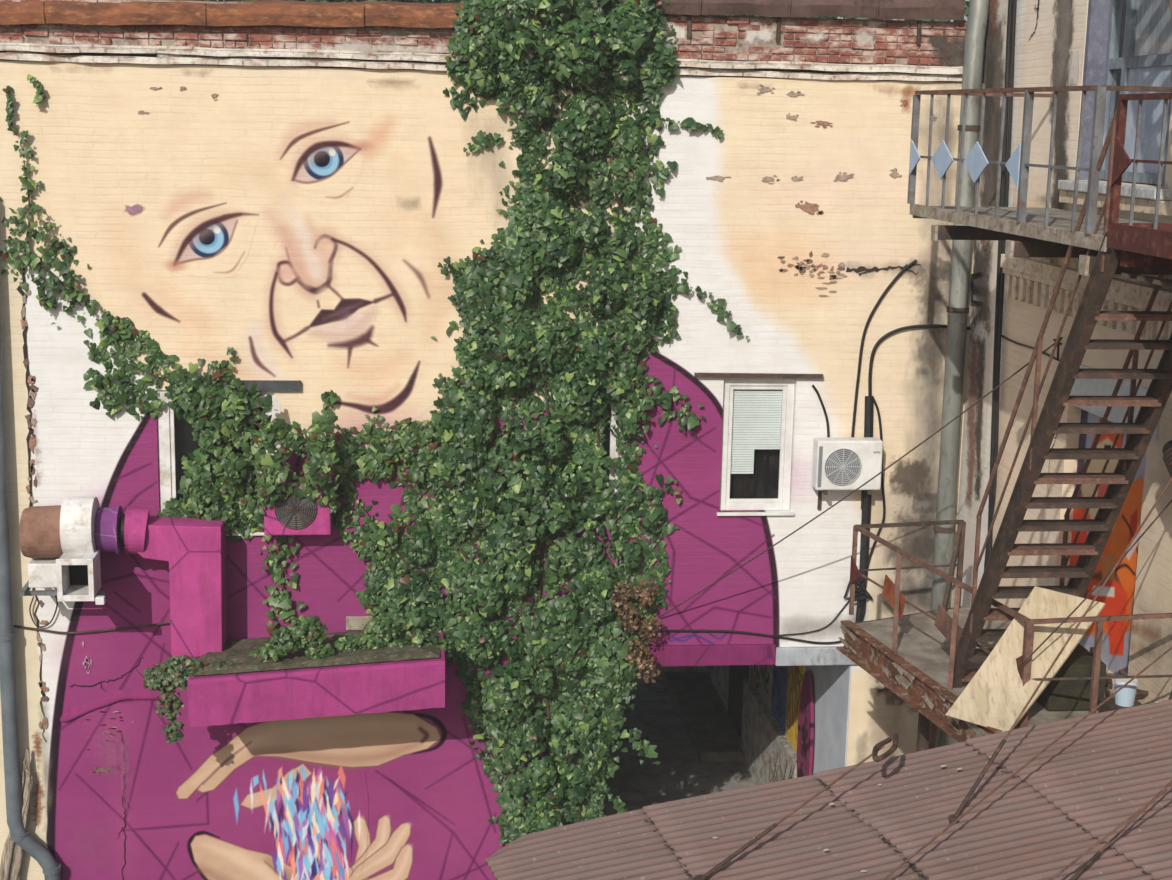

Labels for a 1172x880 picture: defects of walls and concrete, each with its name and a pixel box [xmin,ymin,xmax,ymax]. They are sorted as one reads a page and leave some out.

spalling [757,84,805,97]
spalling [786,113,833,128]
damp [1050,0,1073,209]
spalling [795,201,824,215]
spalling [20,290,31,329]
peeling [778,251,847,297]
damp [970,240,991,333]
spalling [23,358,38,503]
damp [890,279,943,522]
spalling [37,600,48,664]
spalling [38,681,49,702]
crack [111,734,133,880]